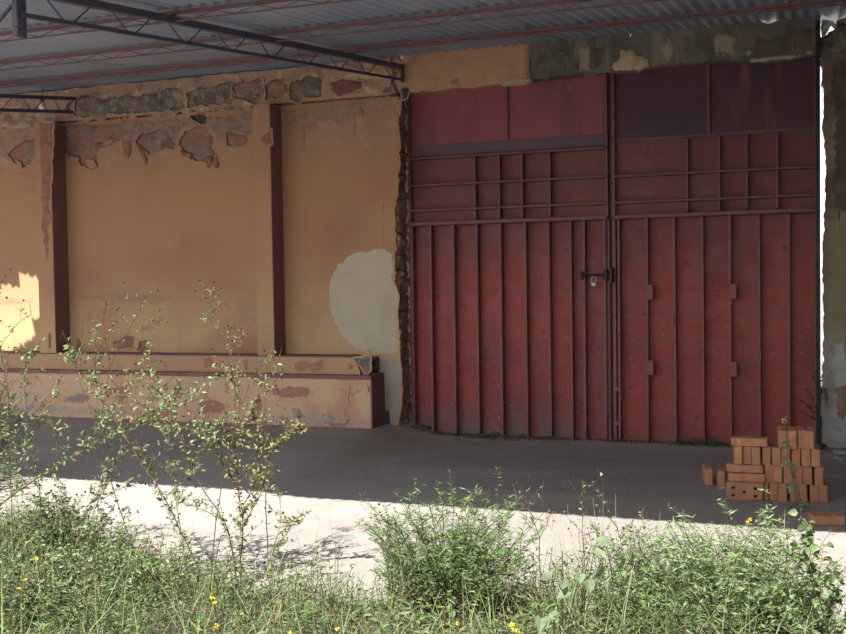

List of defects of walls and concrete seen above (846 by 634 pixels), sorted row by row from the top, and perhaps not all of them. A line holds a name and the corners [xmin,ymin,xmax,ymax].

peeling [581,47,650,76]
peeling [747,48,815,64]
peeling [0,112,55,264]
flaking render [65,66,412,426]
water stain [827,57,846,233]